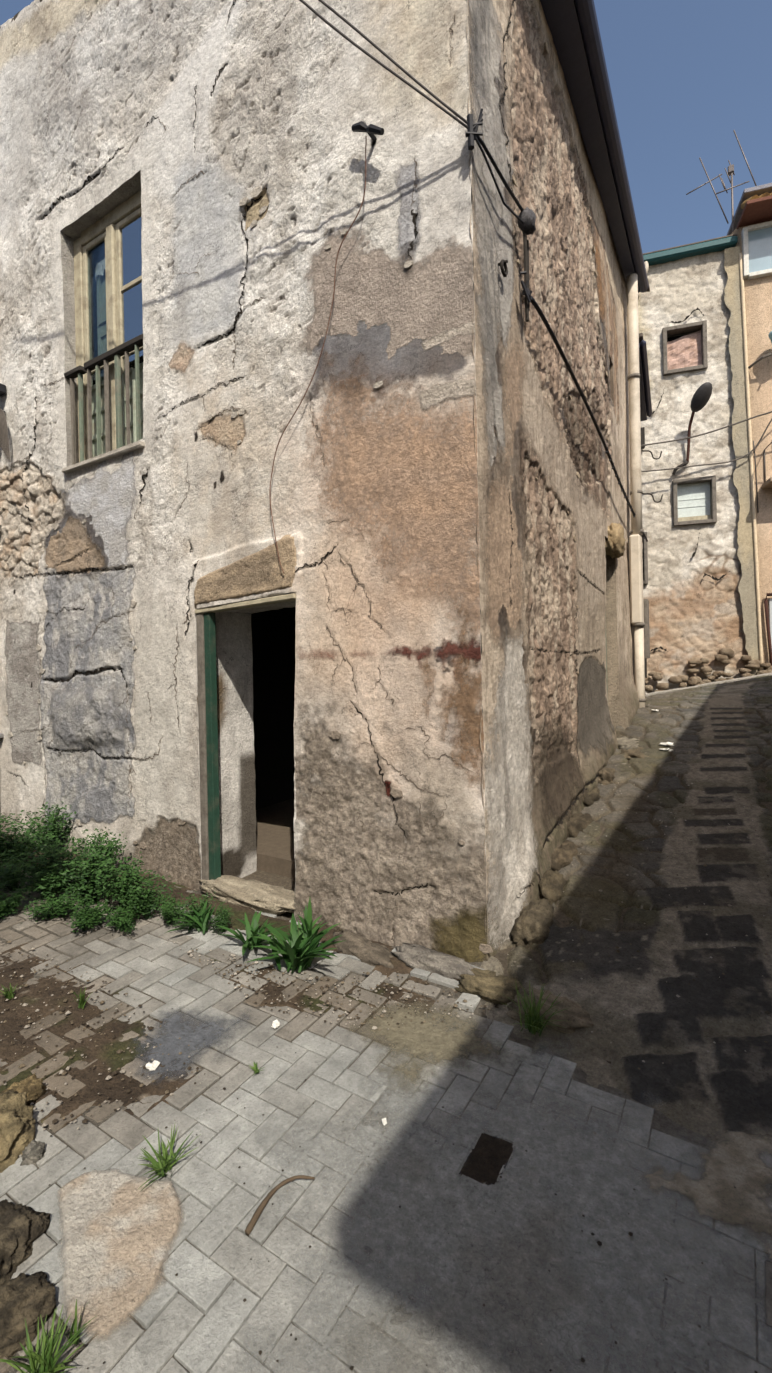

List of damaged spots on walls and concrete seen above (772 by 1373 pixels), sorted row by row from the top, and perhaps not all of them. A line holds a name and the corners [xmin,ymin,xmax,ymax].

crack [42,63,228,220]
crack [499,0,515,192]
flaking render [302,228,475,360]
crack [6,187,267,815]
flaking render [0,460,137,826]
crack [295,520,476,839]
rust [393,639,481,677]